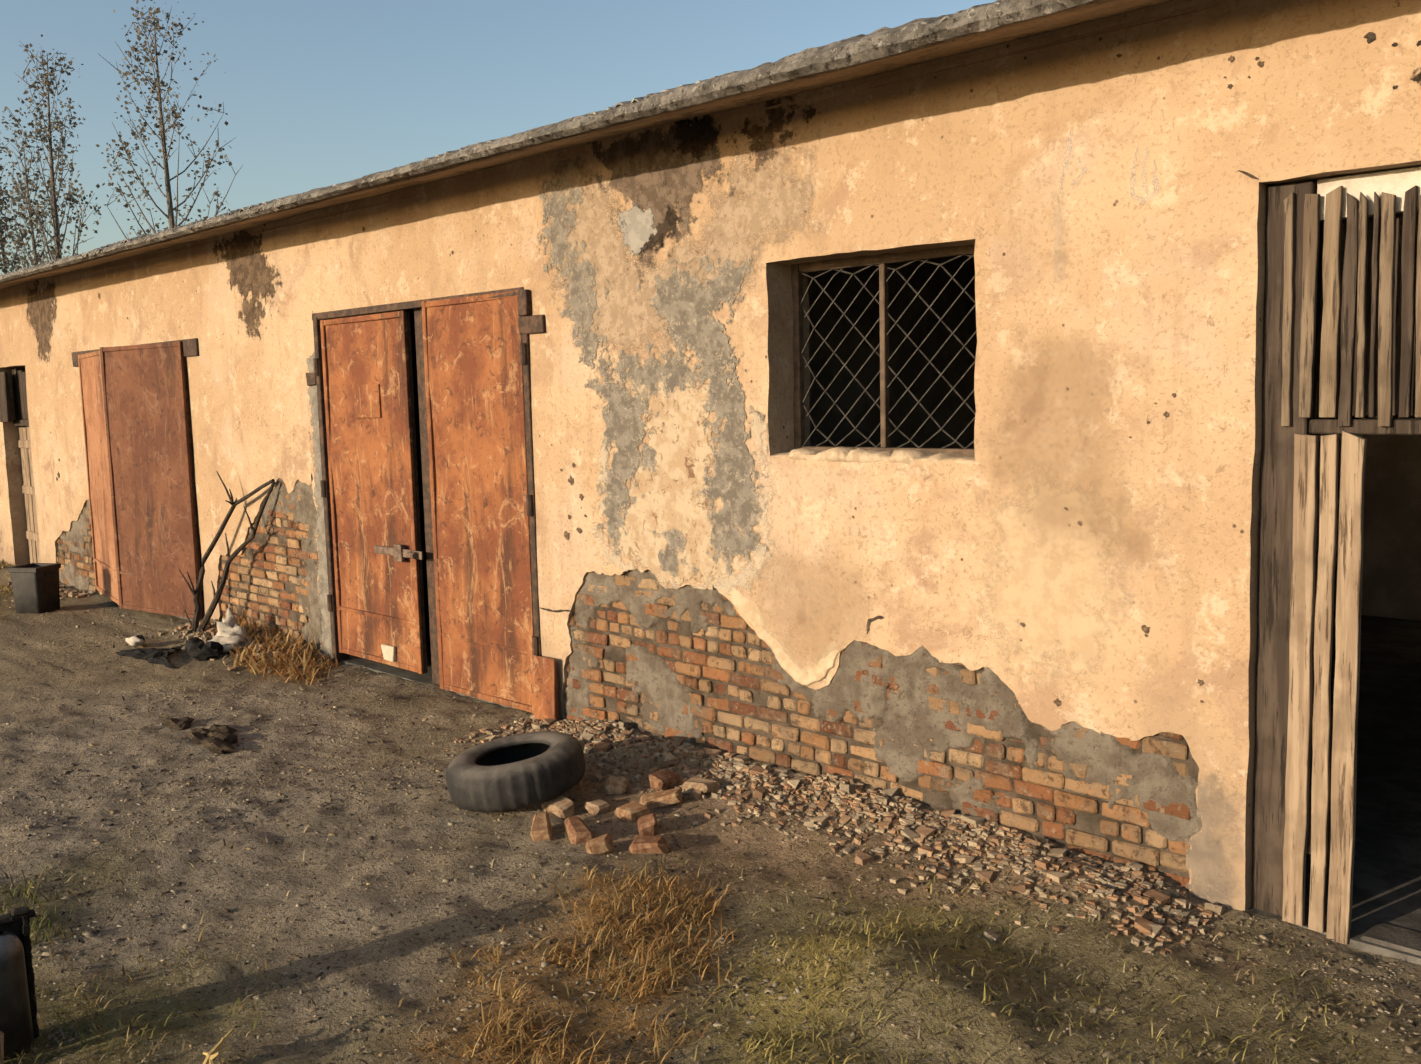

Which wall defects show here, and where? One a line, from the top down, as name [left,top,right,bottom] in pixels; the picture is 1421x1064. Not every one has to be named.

flaking render [57,500,99,592]
flaking render [219,350,332,658]
flaking render [530,114,1202,889]